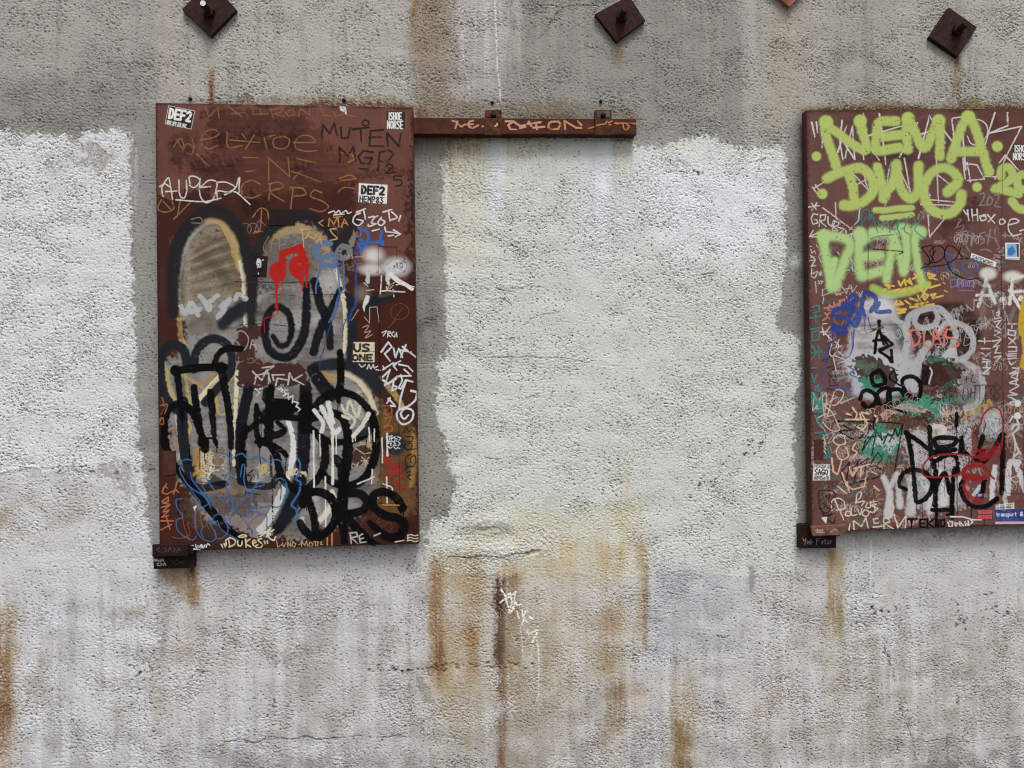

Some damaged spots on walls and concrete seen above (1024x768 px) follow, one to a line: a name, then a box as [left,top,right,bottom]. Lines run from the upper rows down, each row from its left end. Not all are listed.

rust [179,66,645,219]
rust [0,594,26,768]
rust [148,559,207,696]
rust [418,450,705,768]
rust [820,546,851,742]